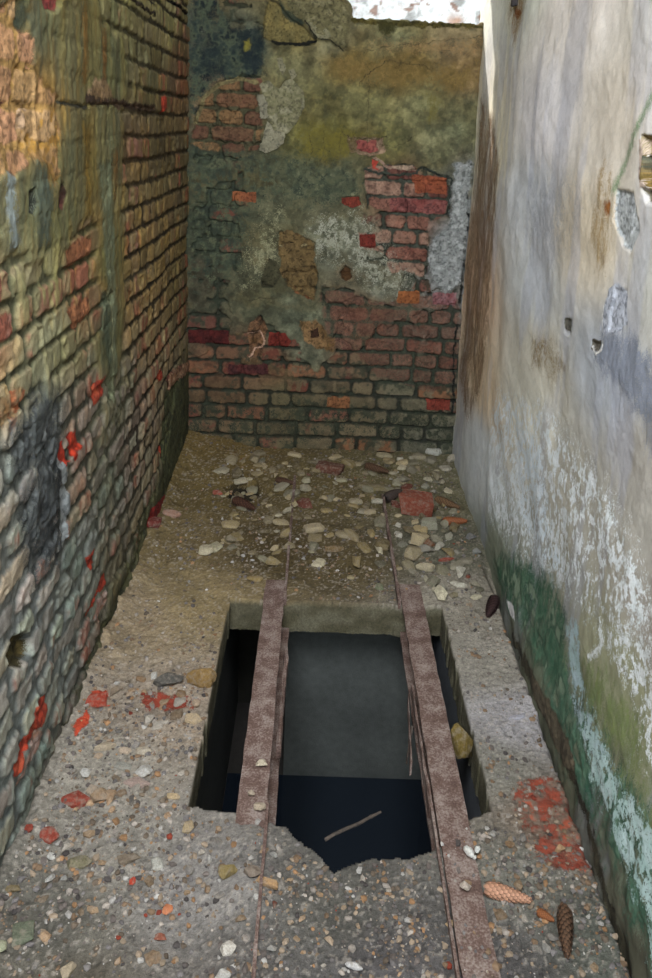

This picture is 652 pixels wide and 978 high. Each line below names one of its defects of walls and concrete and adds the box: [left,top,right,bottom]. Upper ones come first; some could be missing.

flaking render [0,0,62,187]
damp [187,0,268,123]
flaking render [190,0,317,153]
spalling [0,277,12,343]
flaking render [188,329,229,344]
flaking render [227,316,291,375]
damp [186,33,501,453]
damp [521,152,620,294]
flaking render [613,133,652,252]
damp [484,327,652,773]
corrosion [276,649,289,758]
corrosion [407,684,432,818]